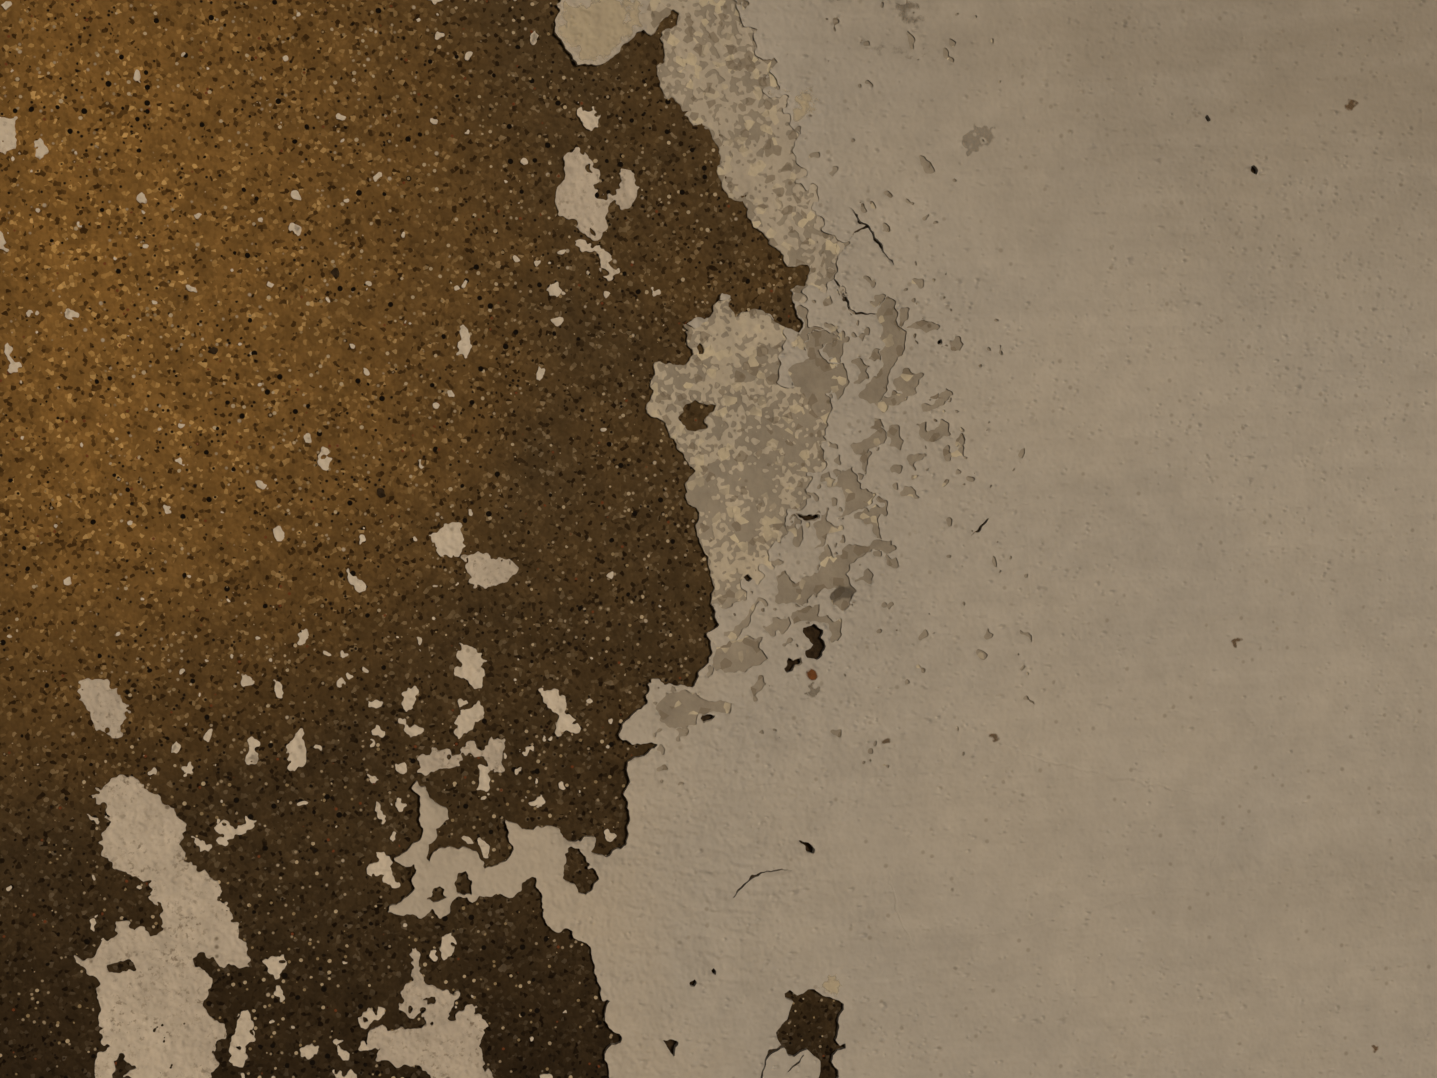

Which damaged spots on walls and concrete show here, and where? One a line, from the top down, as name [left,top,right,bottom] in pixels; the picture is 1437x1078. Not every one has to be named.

peeling [0,0,993,1078]